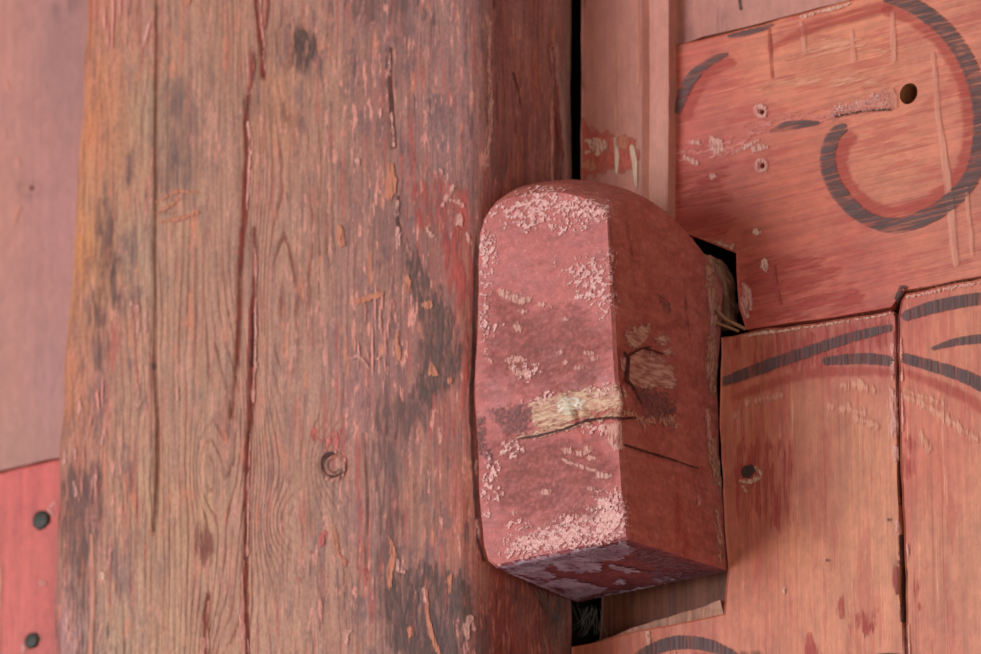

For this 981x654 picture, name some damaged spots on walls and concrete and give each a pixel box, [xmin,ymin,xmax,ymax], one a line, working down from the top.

peeling [581,118,639,187]
peeling [441,184,623,363]
peeling [477,323,712,600]